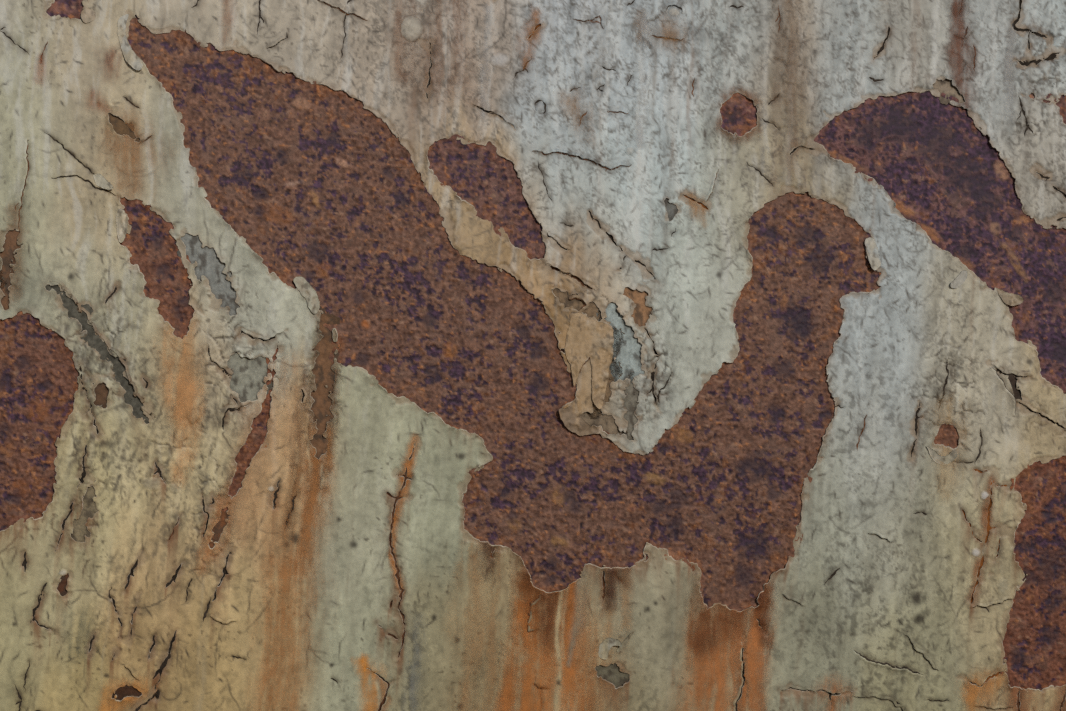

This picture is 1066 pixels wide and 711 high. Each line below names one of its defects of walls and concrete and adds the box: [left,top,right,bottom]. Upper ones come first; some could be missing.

peeling [0,228,82,531]
crack [45,278,156,552]
peeling [93,174,240,339]
peeling [118,14,882,612]
peeling [814,78,1066,394]
crack [88,559,177,711]
crack [165,494,237,625]
crack [367,443,415,711]
corrosion [500,572,553,711]
corrosion [563,582,591,711]
corrosion [689,585,769,711]
peeling [1000,455,1066,692]